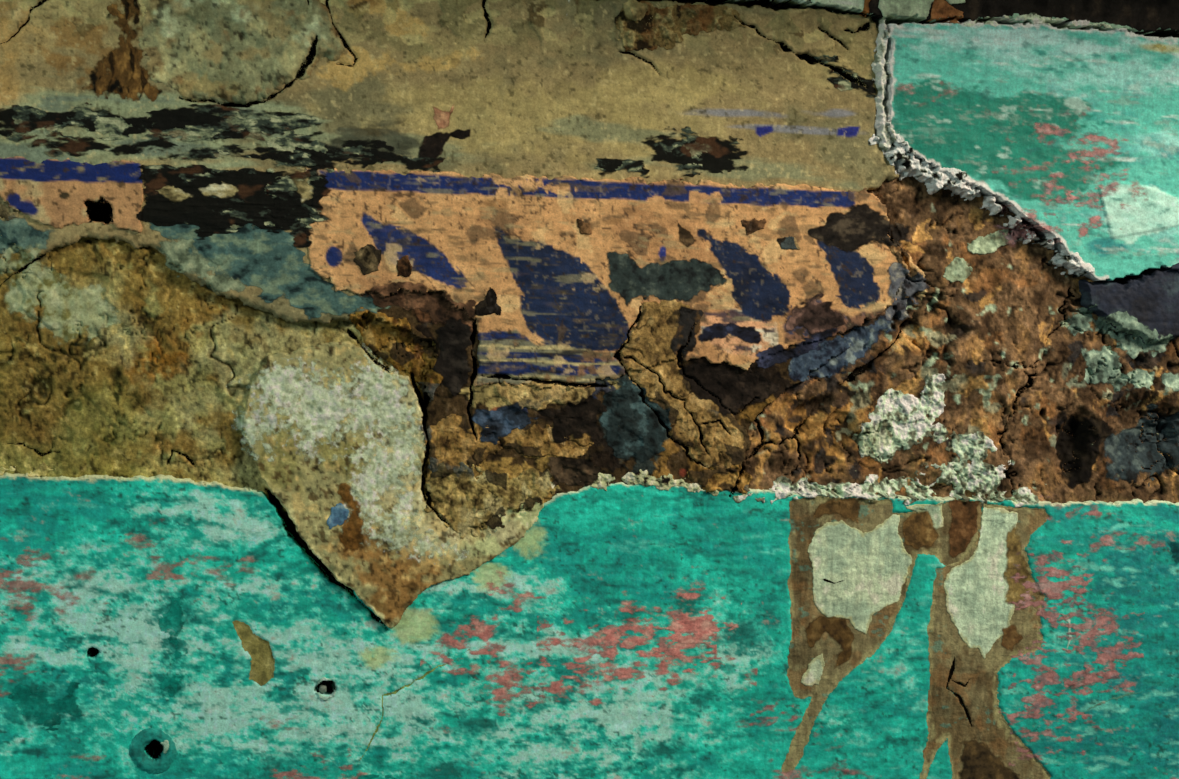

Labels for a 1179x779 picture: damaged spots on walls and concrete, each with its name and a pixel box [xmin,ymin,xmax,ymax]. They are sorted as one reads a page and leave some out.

crack [179,0,358,107]
crack [482,0,491,38]
crack [659,0,870,88]
peeling [859,0,1179,38]
spalling [0,18,1179,629]
crack [467,305,808,497]
crack [839,320,906,385]
crack [992,288,1075,494]
peeling [232,620,275,686]
peeling [420,602,738,716]
peeling [774,496,982,779]
peeling [919,504,1092,779]